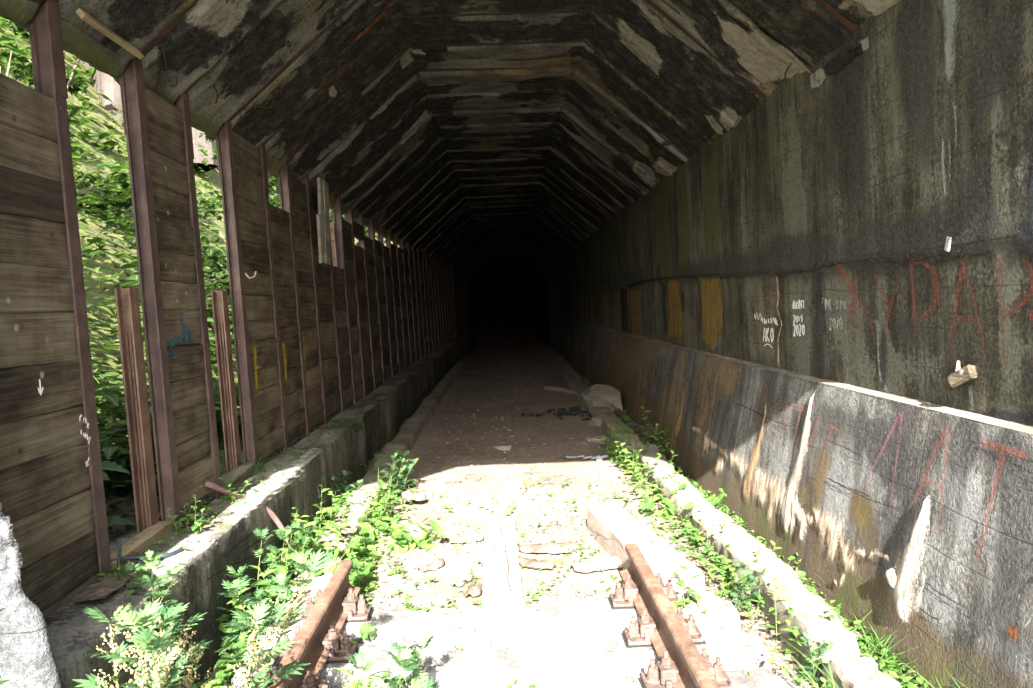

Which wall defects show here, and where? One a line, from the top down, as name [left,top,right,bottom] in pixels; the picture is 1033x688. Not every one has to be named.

spalling [636,0,671,37]
spalling [854,0,900,17]
spalling [617,17,663,78]
damp [943,0,957,81]
spalling [704,106,739,136]
damp [941,102,957,195]
spalling [632,156,677,187]